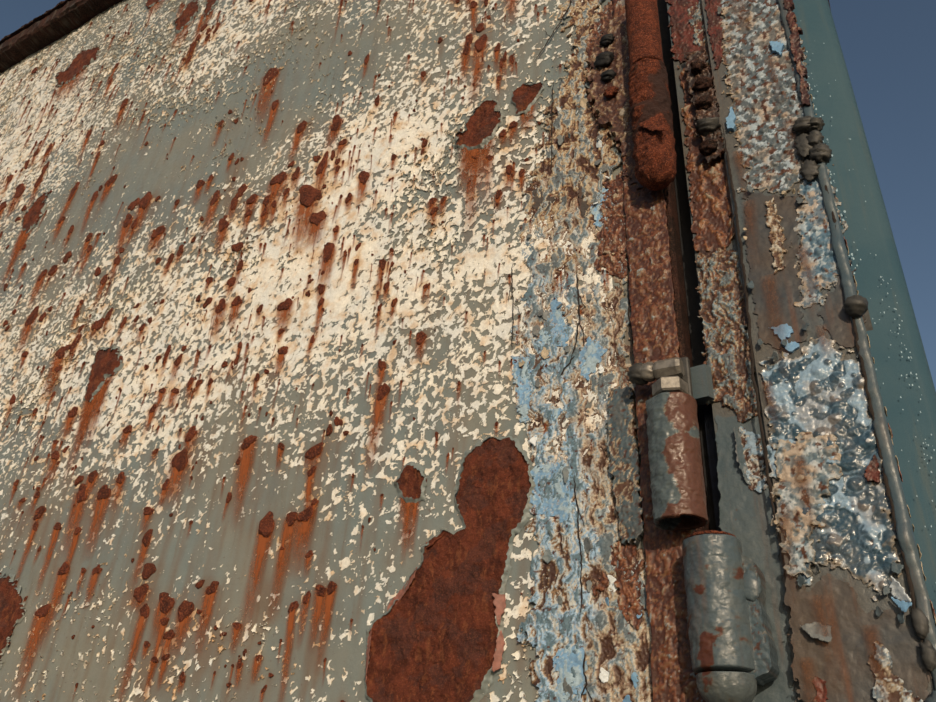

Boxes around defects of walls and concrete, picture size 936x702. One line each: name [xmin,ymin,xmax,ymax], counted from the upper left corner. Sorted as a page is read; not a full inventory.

corrosion [0,68,428,702]
peeling [0,0,653,702]
corrosion [409,329,436,352]
corrosion [429,196,447,226]
corrosion [363,421,536,702]
corrosion [443,0,517,100]
corrosion [451,81,544,209]
peeling [695,185,933,702]